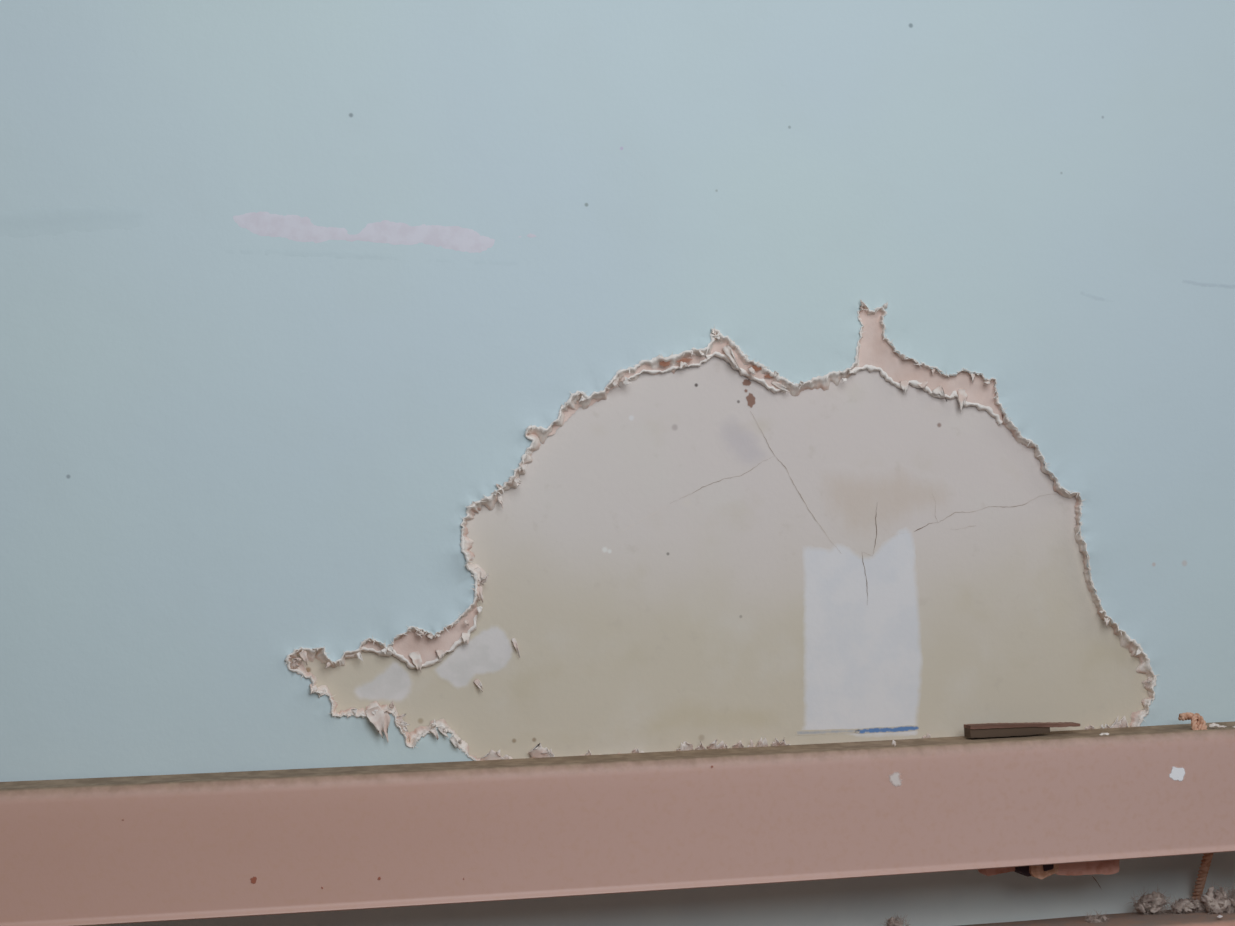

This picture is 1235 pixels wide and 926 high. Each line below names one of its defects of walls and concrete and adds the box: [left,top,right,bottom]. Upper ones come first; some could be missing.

peeling [723,345,755,375]
peeling [900,369,998,411]
crack [614,413,1049,601]
peeling [347,701,406,742]
peeling [480,749,509,760]
peeling [528,743,554,758]
peeling [1169,767,1185,781]